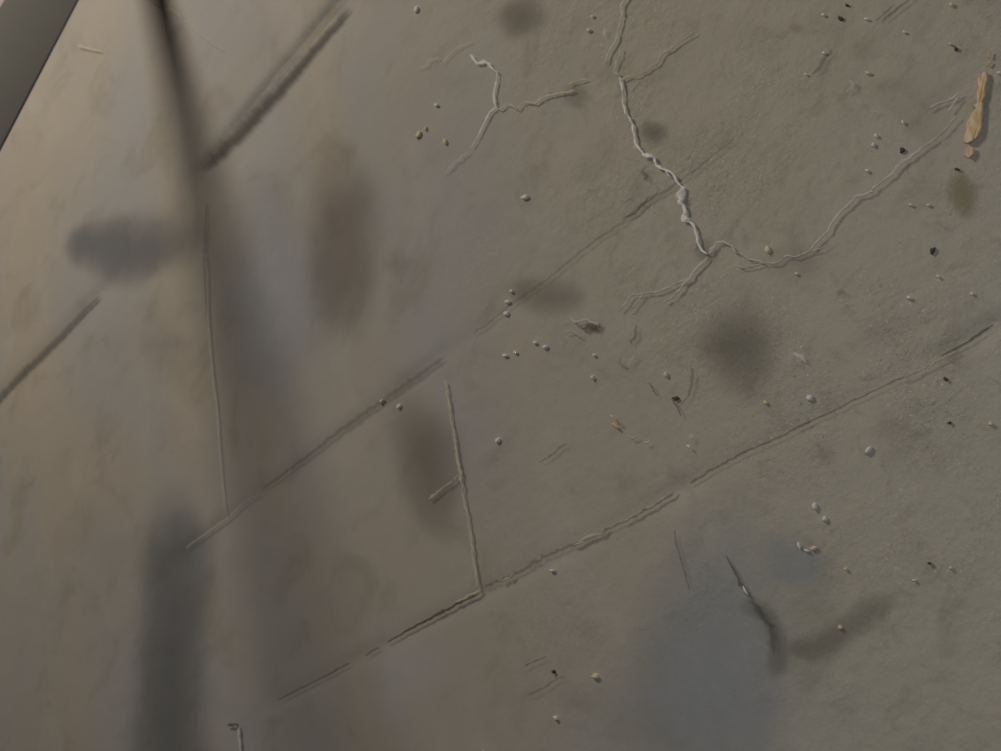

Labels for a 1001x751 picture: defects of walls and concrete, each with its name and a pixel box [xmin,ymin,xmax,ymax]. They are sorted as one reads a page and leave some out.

crack [470,54,586,147]
crack [605,0,961,311]
crack [943,324,993,355]
crack [388,381,514,642]
crack [727,557,749,596]